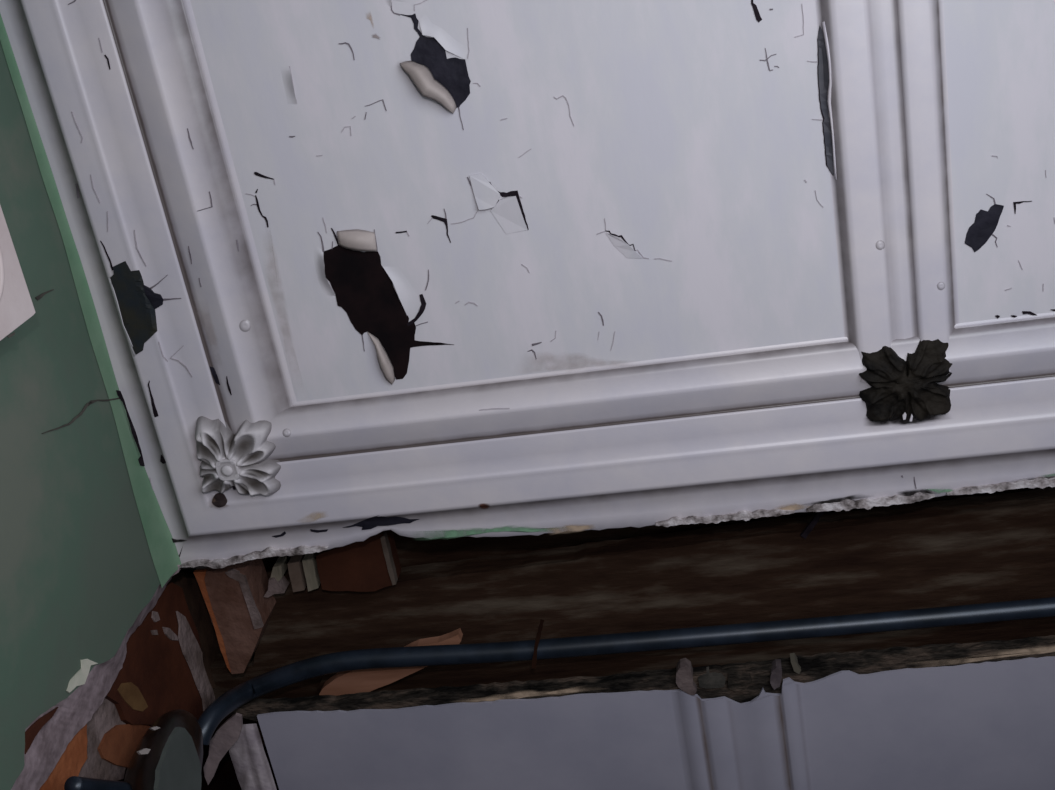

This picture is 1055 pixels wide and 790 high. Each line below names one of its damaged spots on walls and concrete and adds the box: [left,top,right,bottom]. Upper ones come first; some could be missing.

peeling [391,6,471,130]
crack [751,0,773,22]
crack [760,6,804,71]
peeling [808,21,837,180]
crack [246,172,275,227]
crack [396,173,529,243]
crack [598,218,672,262]
peeling [965,194,1004,252]
crack [1007,201,1032,227]
peeling [100,241,181,356]
peeling [313,218,454,385]
peeling [343,516,419,530]